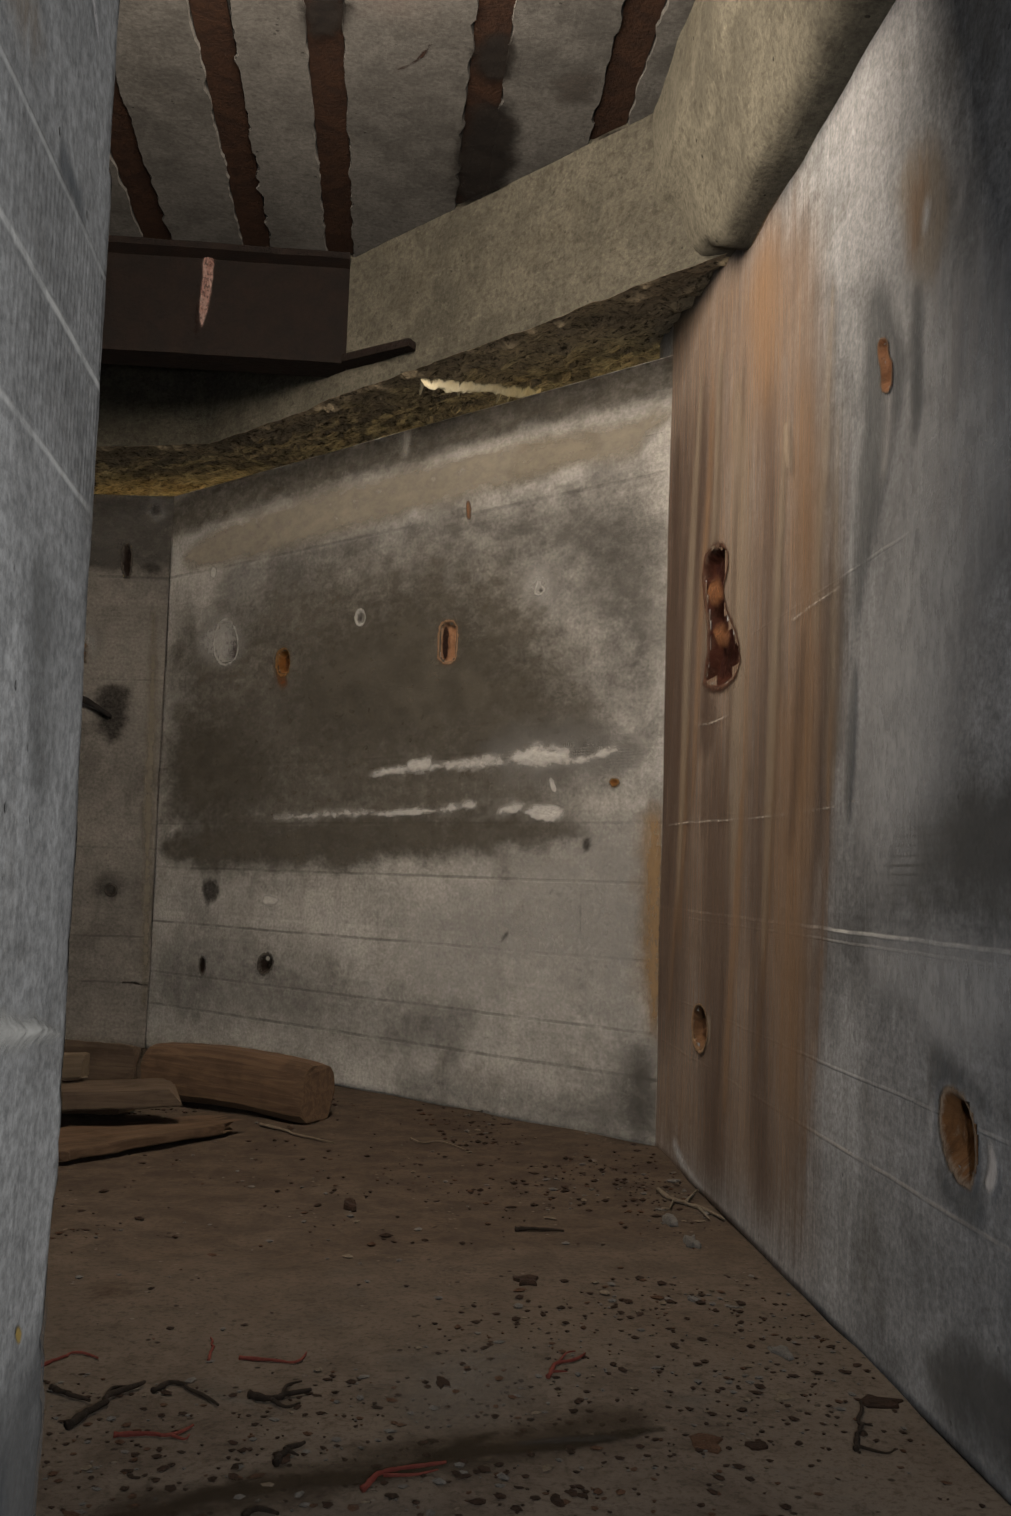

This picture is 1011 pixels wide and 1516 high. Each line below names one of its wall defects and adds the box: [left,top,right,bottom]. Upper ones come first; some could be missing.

leakage [96,685,129,742]
leakage [162,526,624,866]
leakage [482,494,661,668]
corrosion [643,214,836,1251]